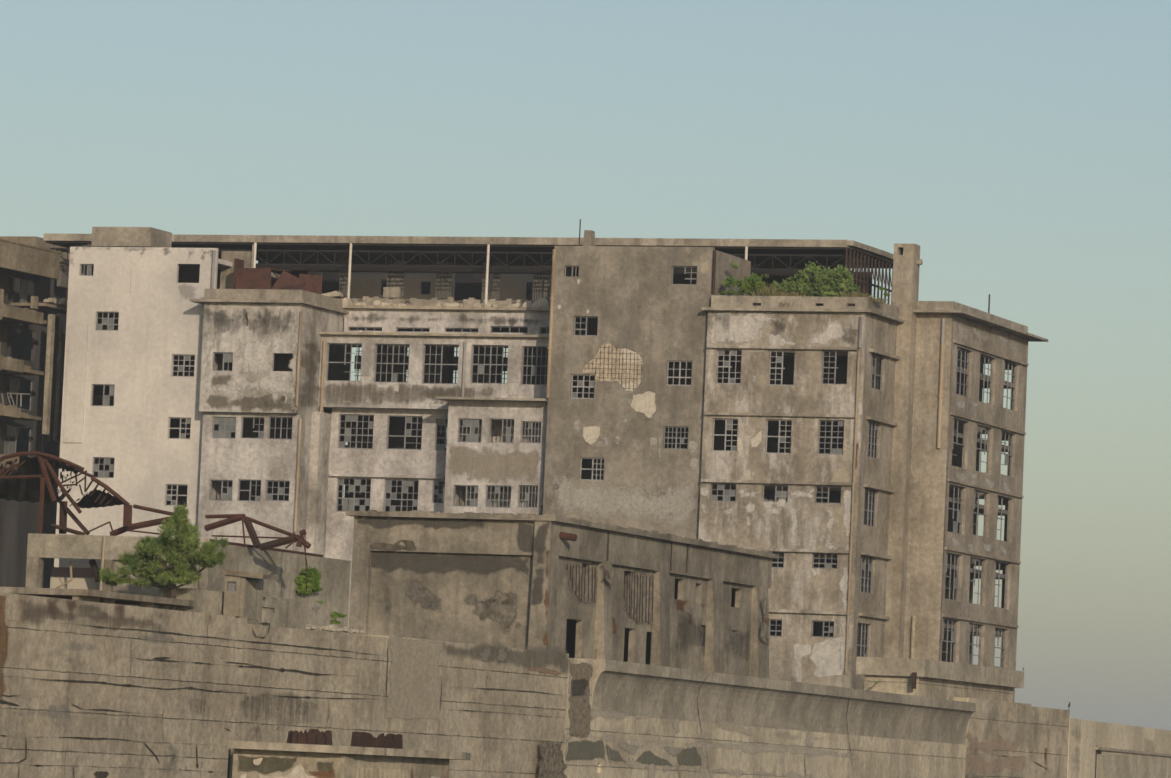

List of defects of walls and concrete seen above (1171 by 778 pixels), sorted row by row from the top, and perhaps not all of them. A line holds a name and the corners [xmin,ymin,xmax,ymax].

flaking render [582,343,656,418]
flaking render [583,426,600,445]
rust [0,596,8,695]
rust [287,729,332,745]
rust [351,732,403,749]
peeling [240,758,317,778]